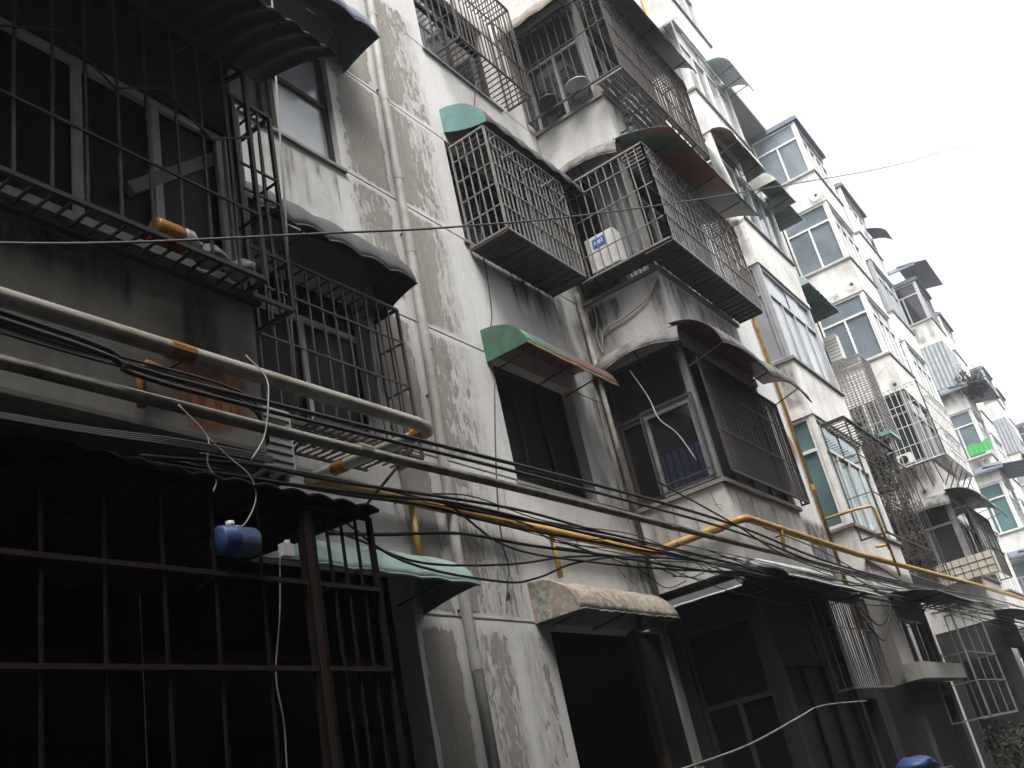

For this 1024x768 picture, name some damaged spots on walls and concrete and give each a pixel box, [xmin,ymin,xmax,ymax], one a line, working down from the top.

peeling [332,0,480,458]
corrosion [170,360,243,427]
peeling [423,626,478,768]
peeling [484,632,530,768]
peeling [534,637,568,768]